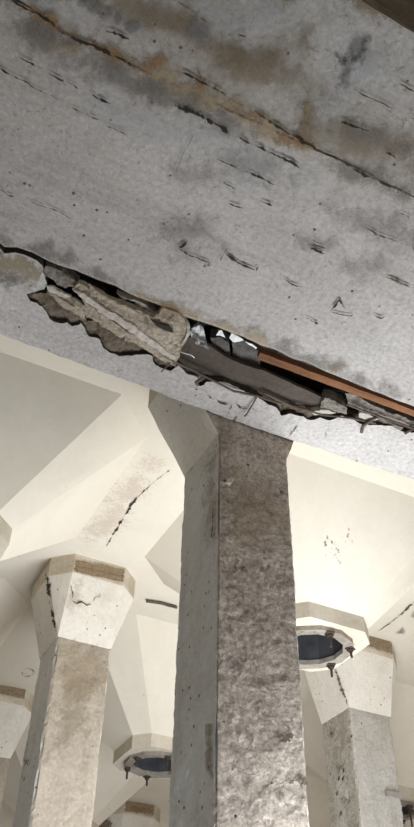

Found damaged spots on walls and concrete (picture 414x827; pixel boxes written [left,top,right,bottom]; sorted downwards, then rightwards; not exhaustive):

crack [11,0,137,70]
crack [0,57,136,135]
rust [96,45,319,152]
crack [162,68,399,193]
crack [217,159,274,208]
spalling [29,260,414,435]
crack [107,471,169,545]
crack [45,574,101,630]
crack [335,671,348,705]